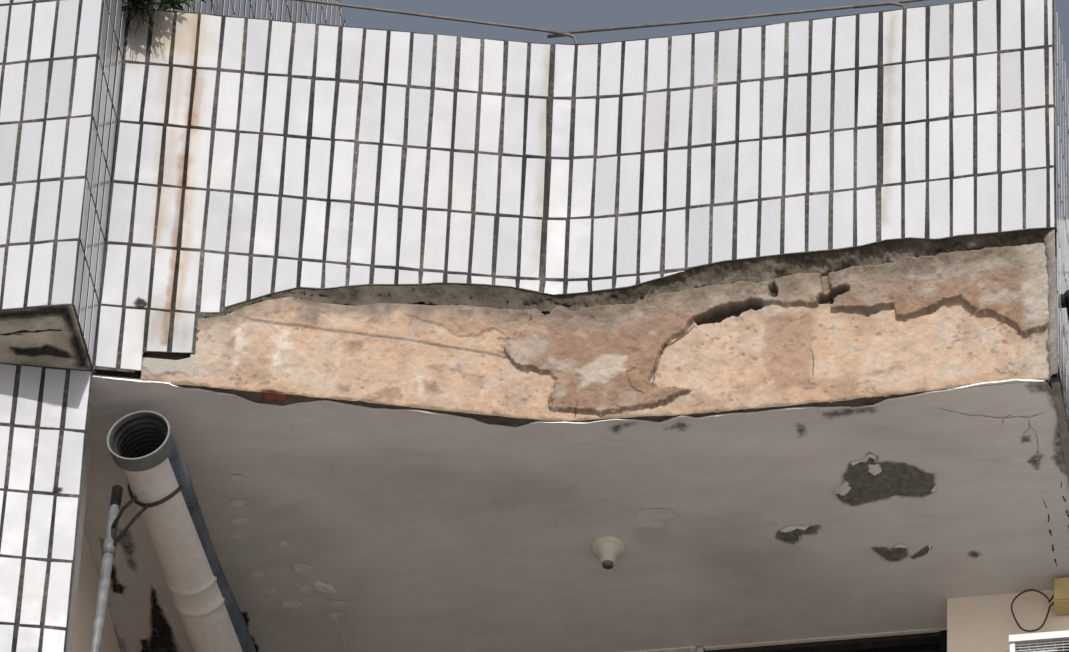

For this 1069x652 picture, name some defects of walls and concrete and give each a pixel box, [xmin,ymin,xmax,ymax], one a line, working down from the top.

crack [0,328,62,336]
spalling [0,306,88,368]
spalling [102,228,1069,429]
crack [944,409,1044,453]
spalling [1054,427,1065,471]
peeling [833,453,937,506]
peeling [776,525,818,543]
peeling [872,544,932,563]